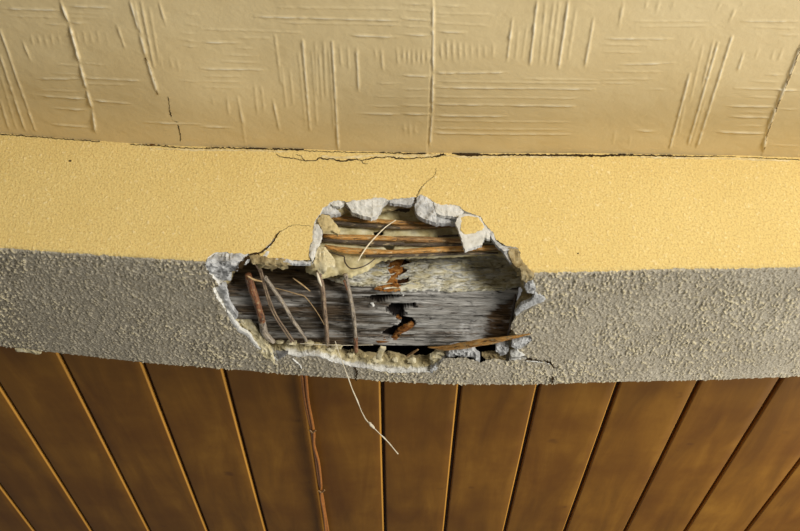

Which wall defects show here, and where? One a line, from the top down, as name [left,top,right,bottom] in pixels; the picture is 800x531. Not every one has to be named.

crack [1,134,100,142]
crack [130,51,800,204]
crack [236,225,308,270]
spalling [205,195,546,373]
corrosion [374,259,410,292]
corrosion [376,315,415,343]